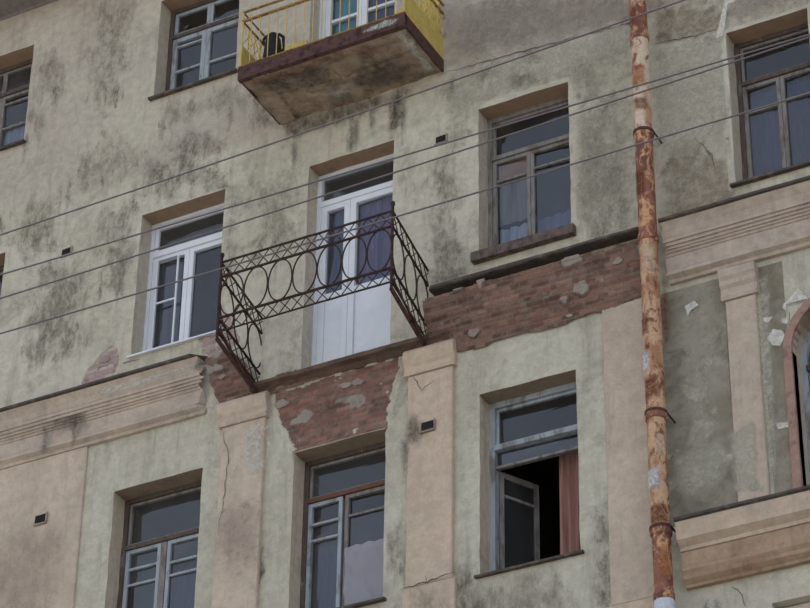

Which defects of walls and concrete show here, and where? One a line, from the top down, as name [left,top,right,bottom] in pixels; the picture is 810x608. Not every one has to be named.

peeling [658,0,735,43]
spalling [422,227,654,352]
spalling [77,340,126,386]
spalling [102,311,253,403]
spalling [269,356,404,464]
corrosion [645,376,656,396]
flaking render [756,261,807,493]
crack [218,434,229,531]
crack [400,572,453,590]